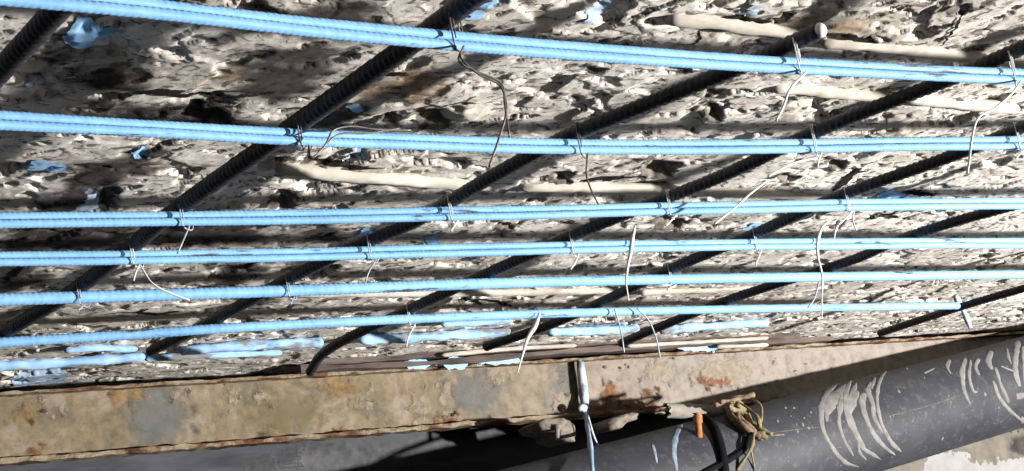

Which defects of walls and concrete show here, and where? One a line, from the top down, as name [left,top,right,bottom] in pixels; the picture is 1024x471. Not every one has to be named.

corrosion [591,378,663,413]
corrosion [690,373,730,387]